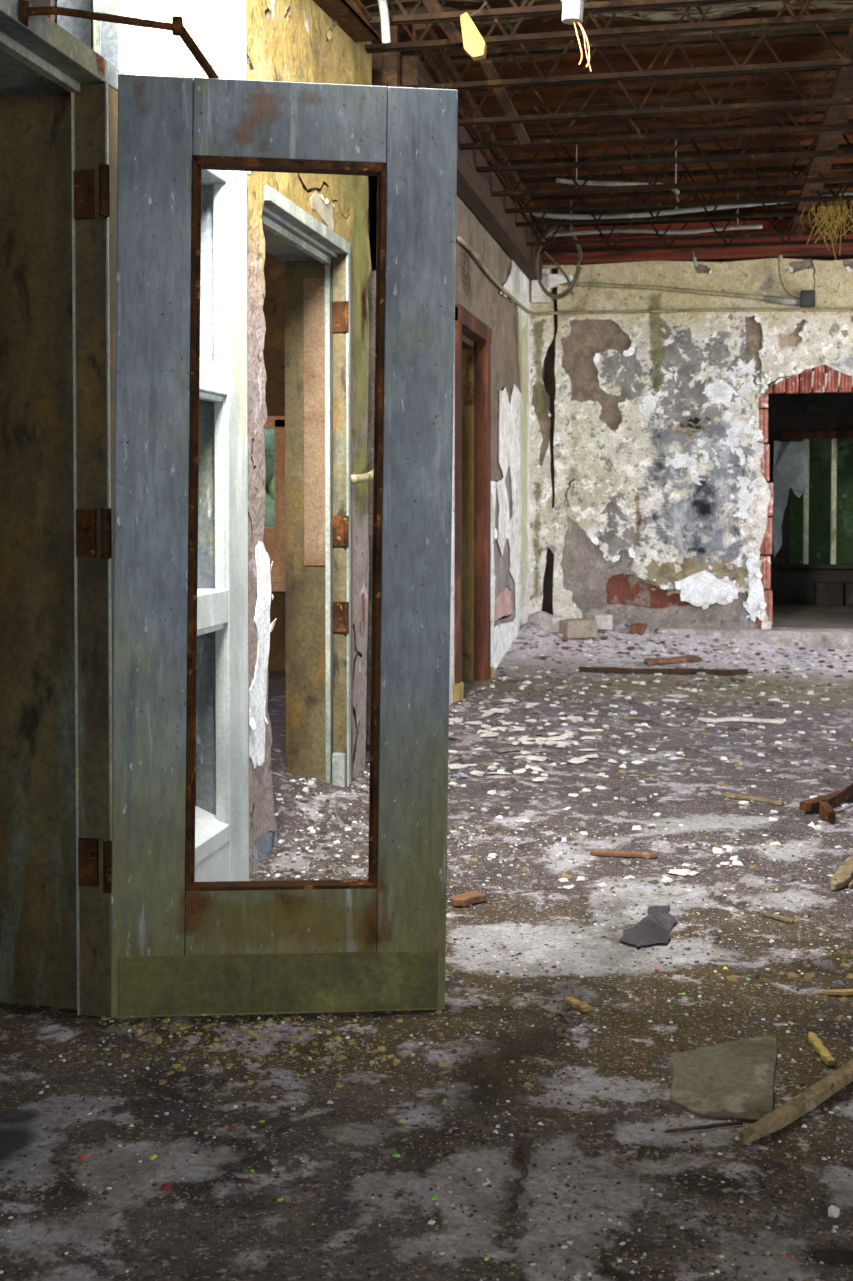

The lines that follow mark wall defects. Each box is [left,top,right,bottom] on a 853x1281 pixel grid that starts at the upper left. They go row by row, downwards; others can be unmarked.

flaking render [455,192,551,627]
peeling [560,315,765,525]
leakage [637,294,757,586]
peeling [249,541,276,769]
flaking render [560,492,767,629]